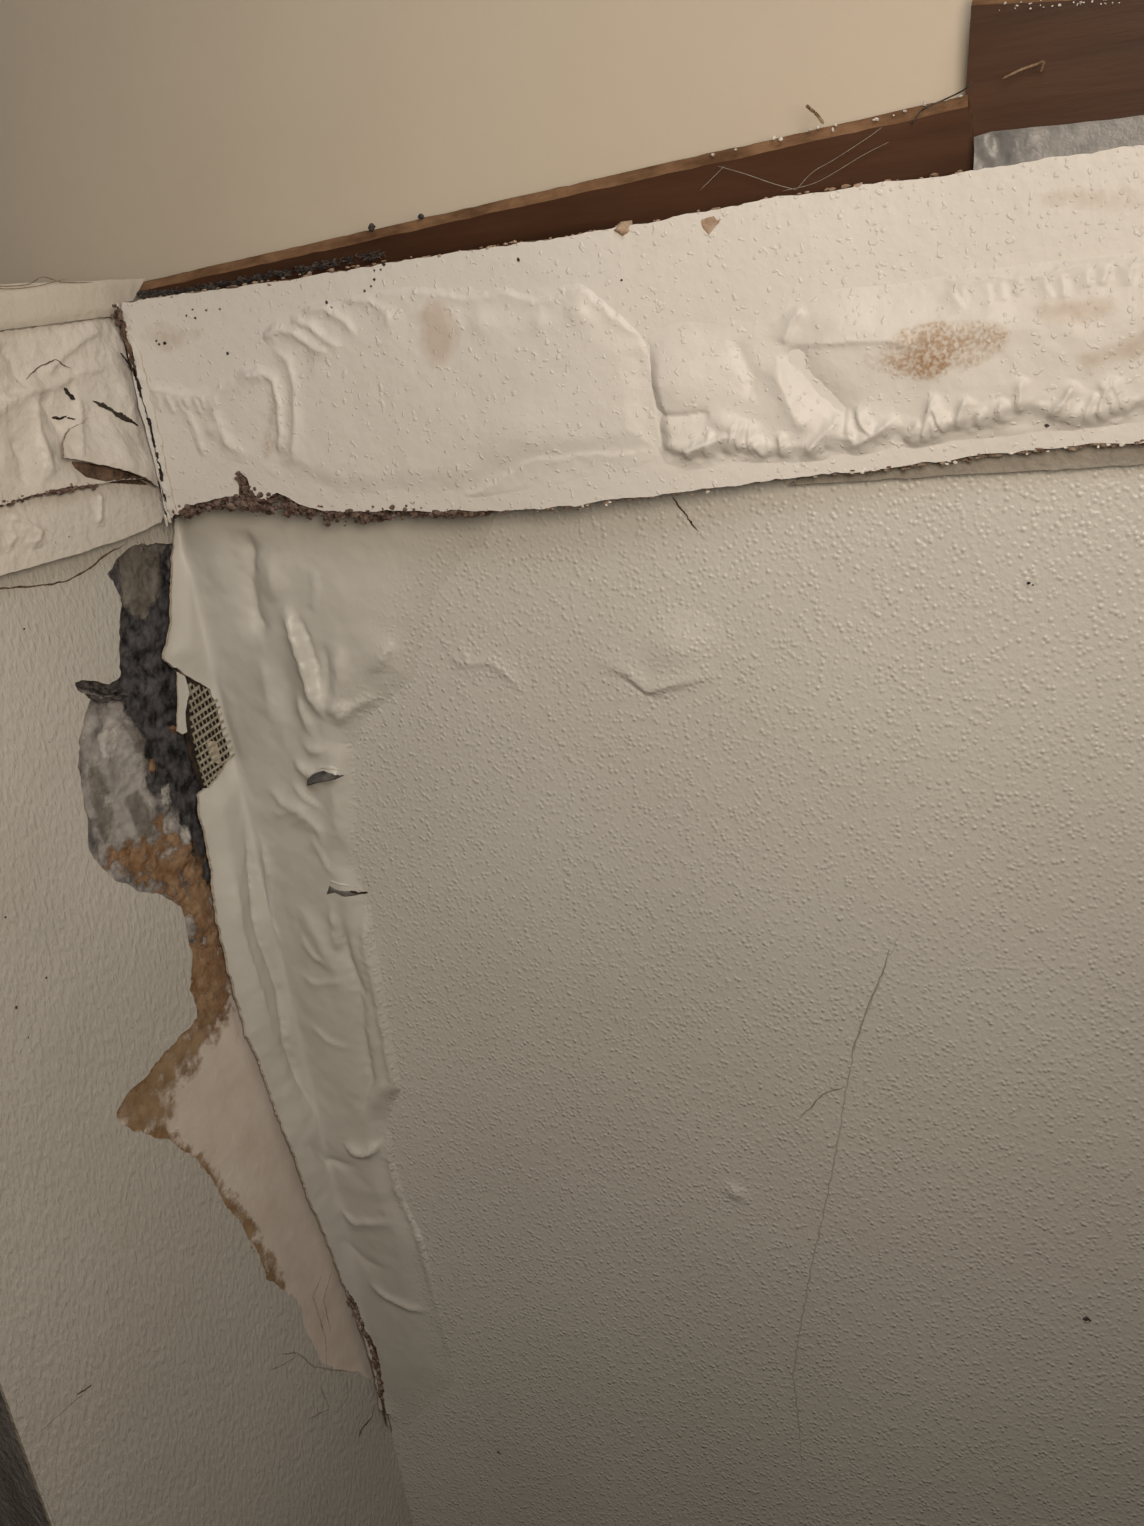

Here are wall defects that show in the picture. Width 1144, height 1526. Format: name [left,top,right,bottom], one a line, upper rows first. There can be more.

peeling [0,318,160,507]
peeling [75,471,495,1421]
crack [792,931,902,1462]